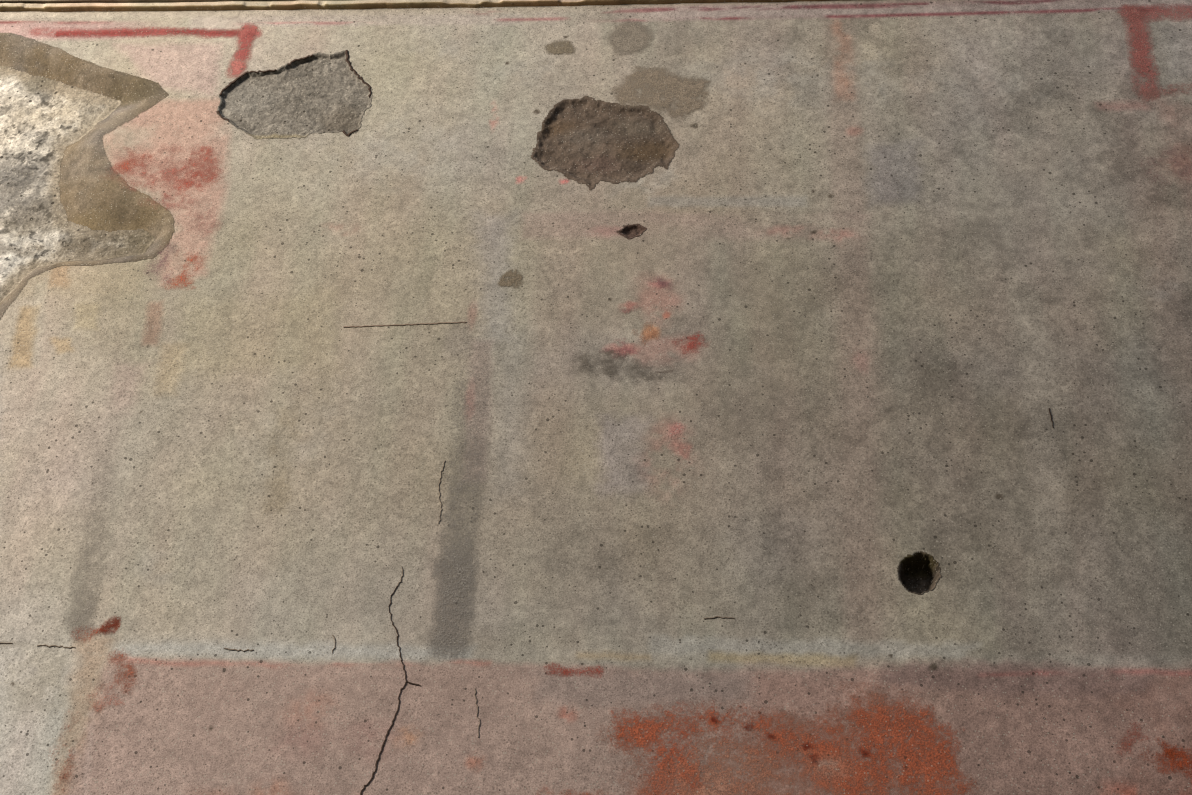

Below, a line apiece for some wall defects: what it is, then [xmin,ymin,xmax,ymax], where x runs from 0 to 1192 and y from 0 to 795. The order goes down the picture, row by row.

spalling [0,33,175,319]
spalling [216,50,372,139]
spalling [531,96,679,190]
leakage [431,434,486,658]
crack [360,566,421,795]